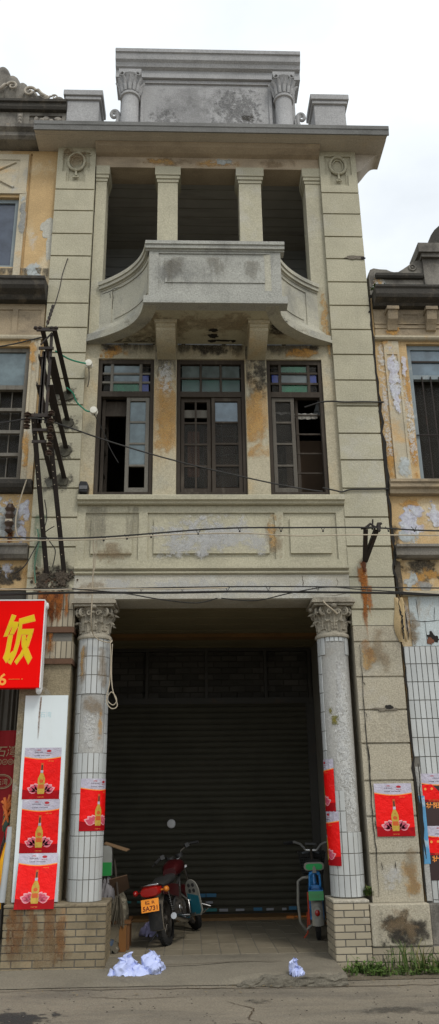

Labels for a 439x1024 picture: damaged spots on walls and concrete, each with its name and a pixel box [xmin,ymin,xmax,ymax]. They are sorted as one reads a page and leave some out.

damp [100,294,330,451]
peeling [378,347,416,477]
peeling [393,500,439,544]
corrosion [358,561,373,625]
damp [383,910,429,946]